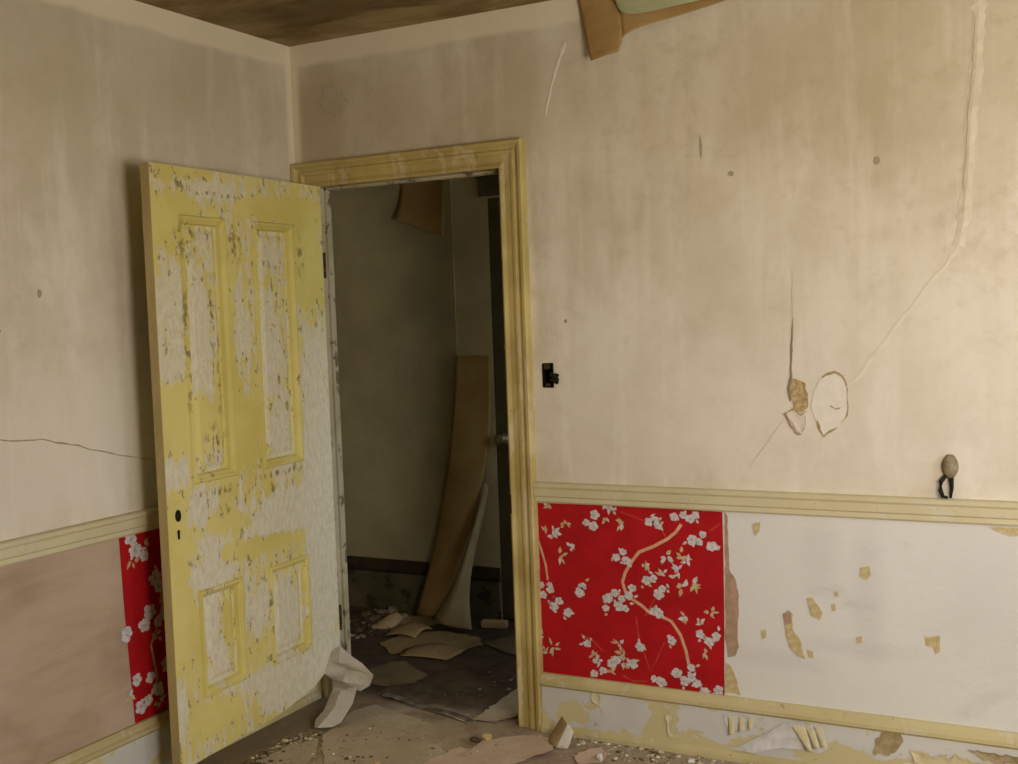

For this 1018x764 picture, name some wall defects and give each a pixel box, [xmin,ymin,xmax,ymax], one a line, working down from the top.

peeling [751,272,849,465]
crack [0,439,154,460]
peeling [991,527,1018,536]
peeling [860,566,871,580]
peeling [724,513,740,695]
peeling [807,591,839,620]
peeling [783,610,813,659]
peeling [925,636,940,654]
peeling [724,712,828,754]
peeling [873,732,1018,764]